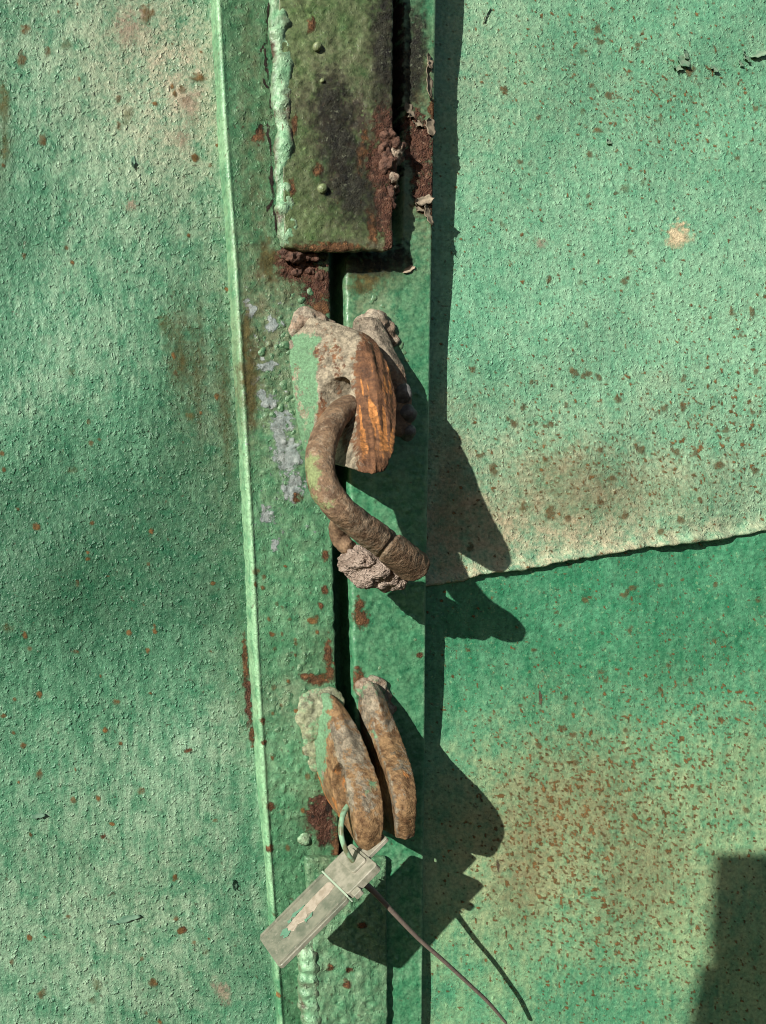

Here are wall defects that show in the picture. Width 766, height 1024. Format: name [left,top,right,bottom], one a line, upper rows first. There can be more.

peeling [426,52,434,100]
peeling [672,48,691,71]
peeling [738,49,766,67]
peeling [404,101,436,137]
corrosion [261,99,434,314]
peeling [414,194,434,225]
peeling [243,298,285,332]
peeling [244,335,307,552]
corrosion [351,595,369,628]
corrosion [300,632,335,686]
corrosion [297,794,339,855]